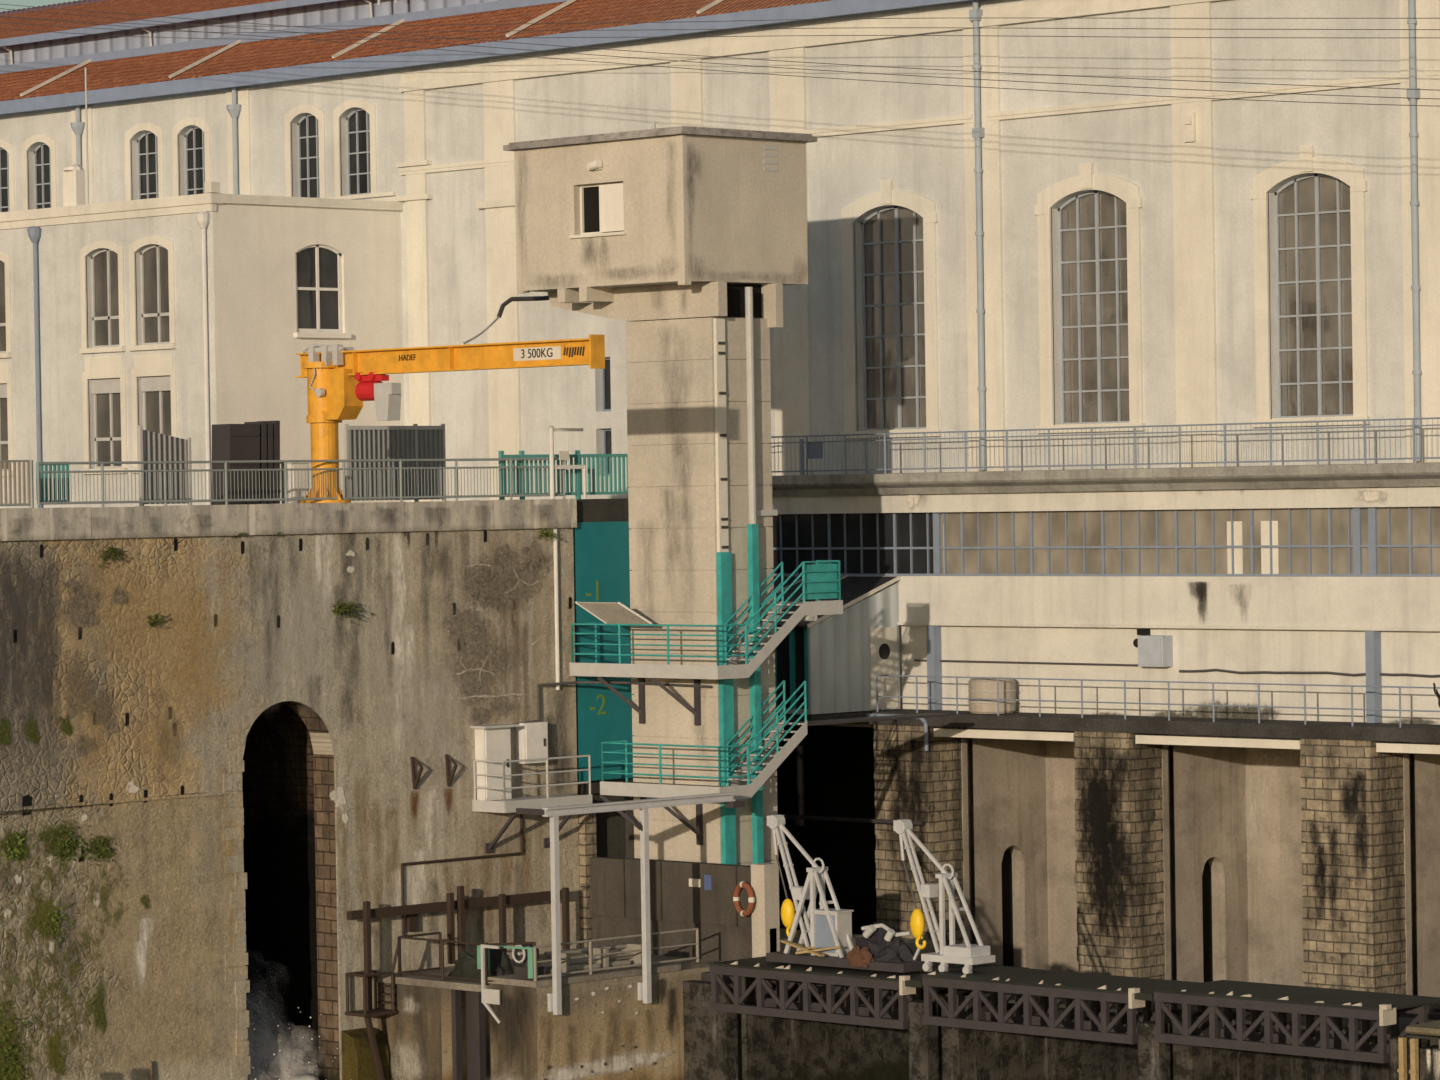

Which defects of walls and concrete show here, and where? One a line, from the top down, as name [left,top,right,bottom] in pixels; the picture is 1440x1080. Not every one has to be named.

damp [1190,582,1206,614]
crack [450,651,526,699]
damp [1079,750,1134,938]
damp [1310,822,1337,917]
damp [1343,772,1367,866]